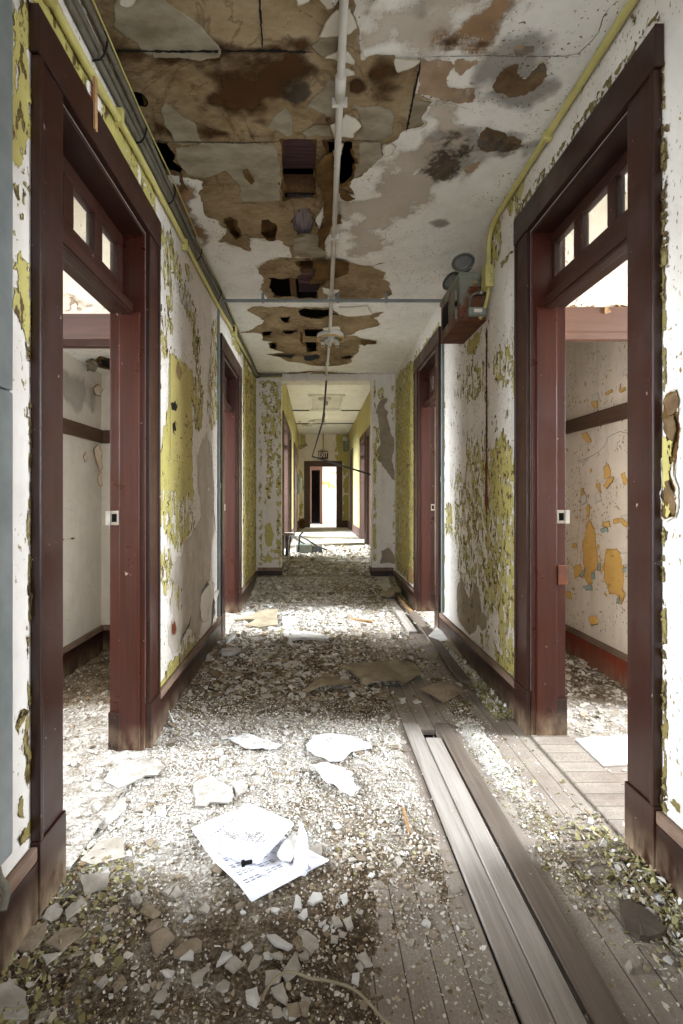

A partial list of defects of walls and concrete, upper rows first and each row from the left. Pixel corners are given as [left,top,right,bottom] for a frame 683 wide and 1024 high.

peeling [13,0,91,362]
peeling [99,96,156,213]
water stain [154,123,172,136]
water stain [197,128,229,138]
water stain [157,39,318,122]
water stain [350,59,397,101]
water stain [419,128,517,182]
flaking render [161,225,218,687]
peeling [231,338,282,586]
peeling [373,322,440,584]
peeling [444,320,514,677]
peeling [565,432,627,626]